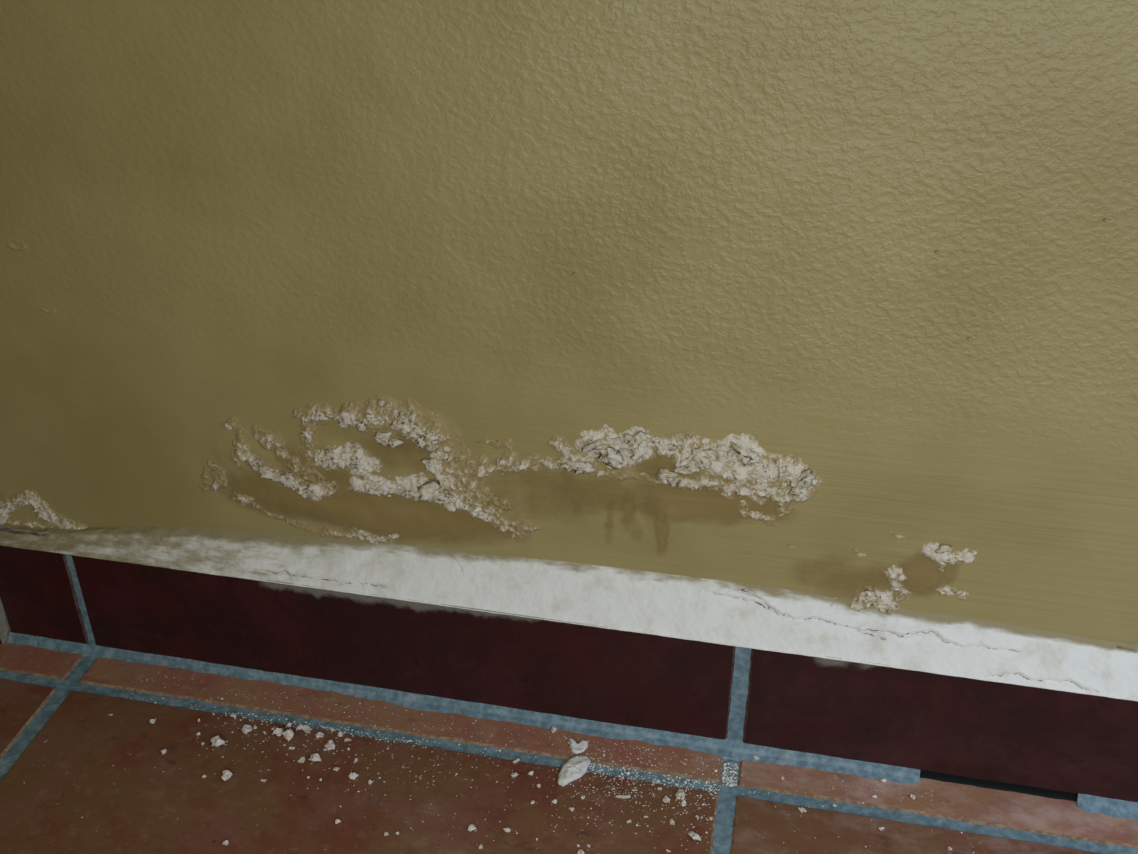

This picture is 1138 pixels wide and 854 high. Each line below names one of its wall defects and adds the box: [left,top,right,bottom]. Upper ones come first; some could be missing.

flaking render [0,489,87,535]
flaking render [197,393,822,558]
flaking render [831,538,977,615]